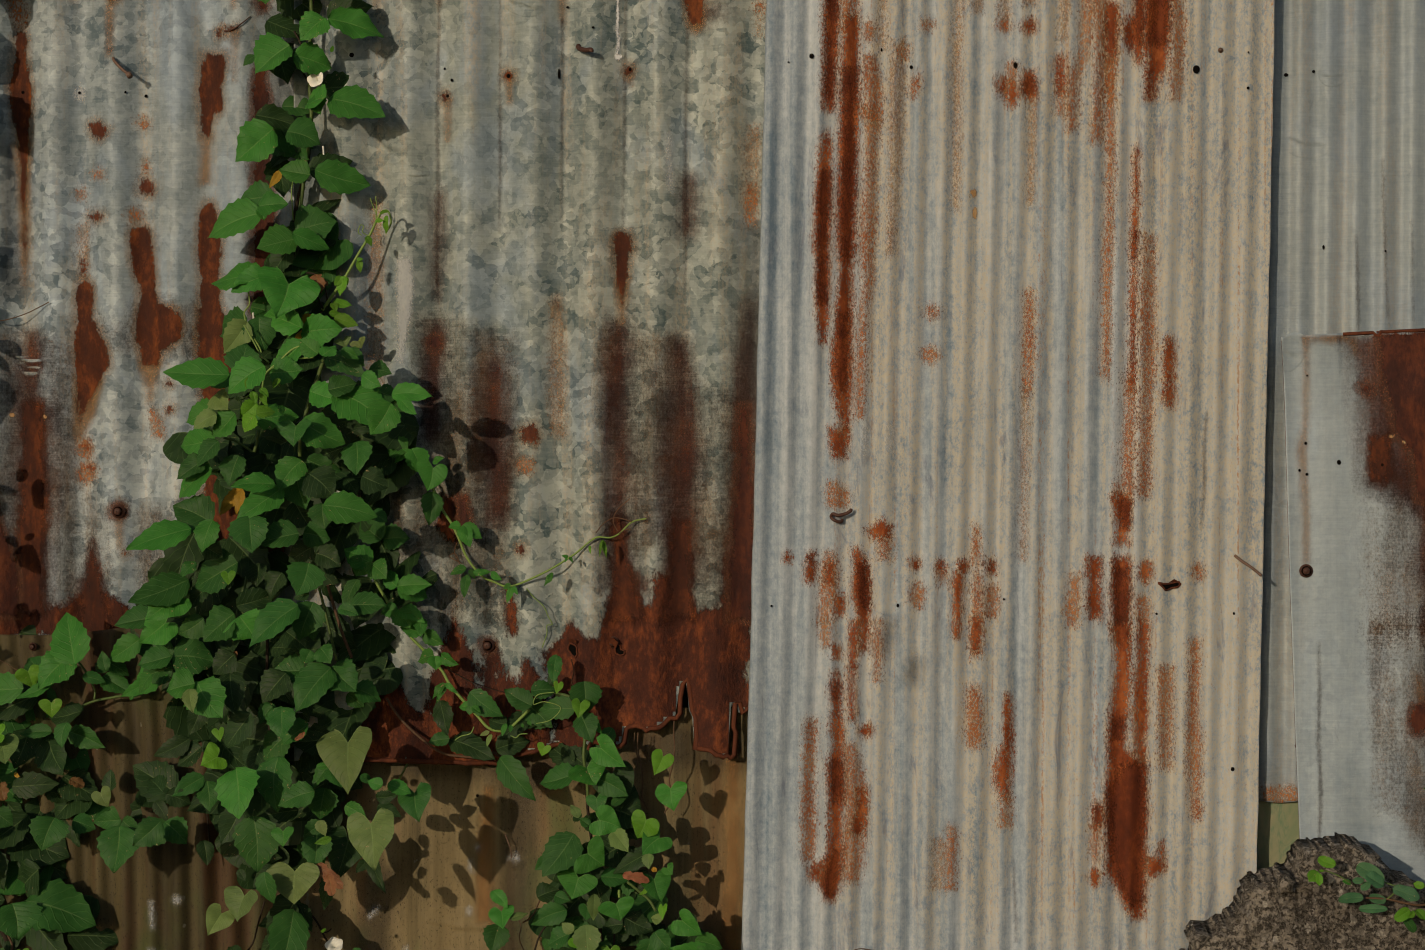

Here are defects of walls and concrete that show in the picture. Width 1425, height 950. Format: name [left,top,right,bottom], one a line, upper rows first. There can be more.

corrosion [5,0,33,254]
corrosion [0,167,162,635]
corrosion [123,157,231,442]
corrosion [198,25,238,181]
corrosion [203,475,238,541]
corrosion [361,230,757,761]
corrosion [780,519,894,904]
corrosion [809,0,924,462]
corrosion [907,523,1003,663]
corrosion [961,683,1018,828]
corrosion [994,0,1208,923]
corrosion [1325,331,1425,846]